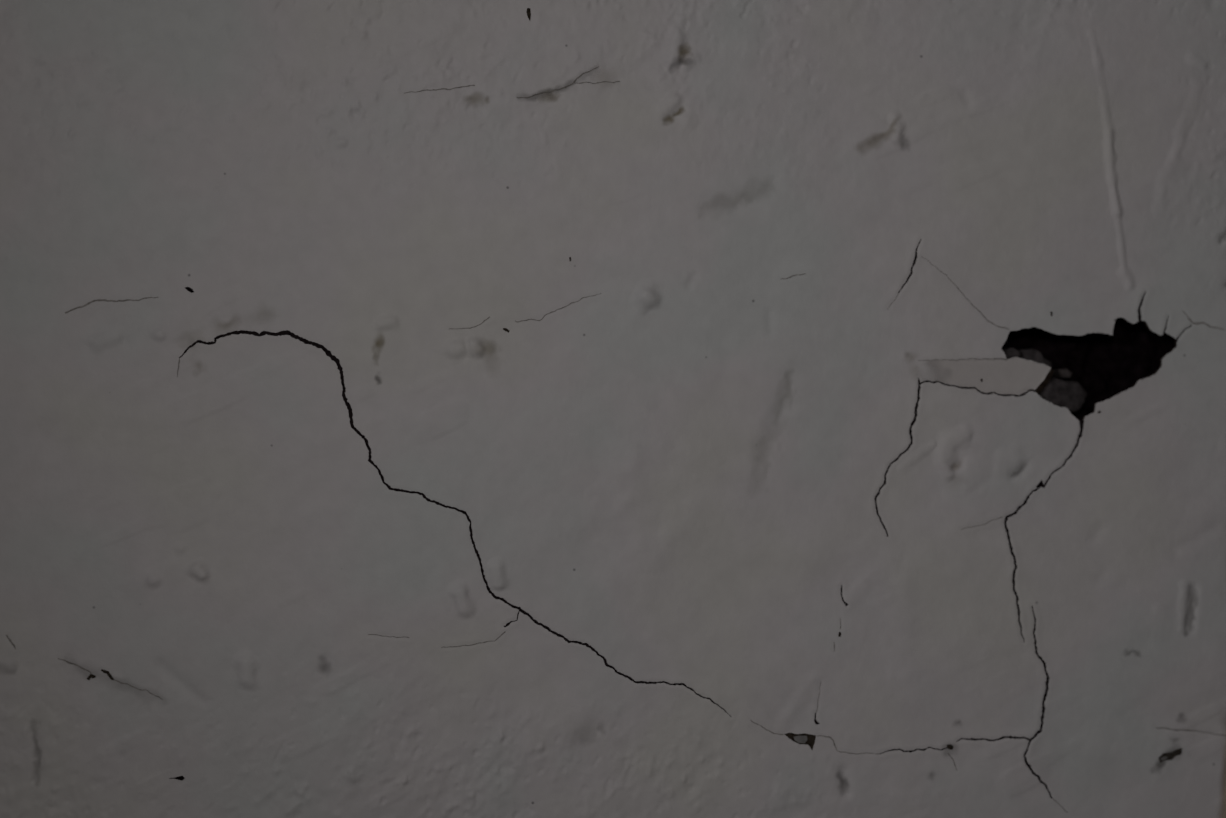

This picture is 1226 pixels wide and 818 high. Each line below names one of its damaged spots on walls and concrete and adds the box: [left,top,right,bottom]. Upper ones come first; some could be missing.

crack [177,330,783,735]
crack [814,419,1084,813]
crack [874,240,1035,537]
spalling [1002,317,1177,420]
crack [1138,291,1225,342]